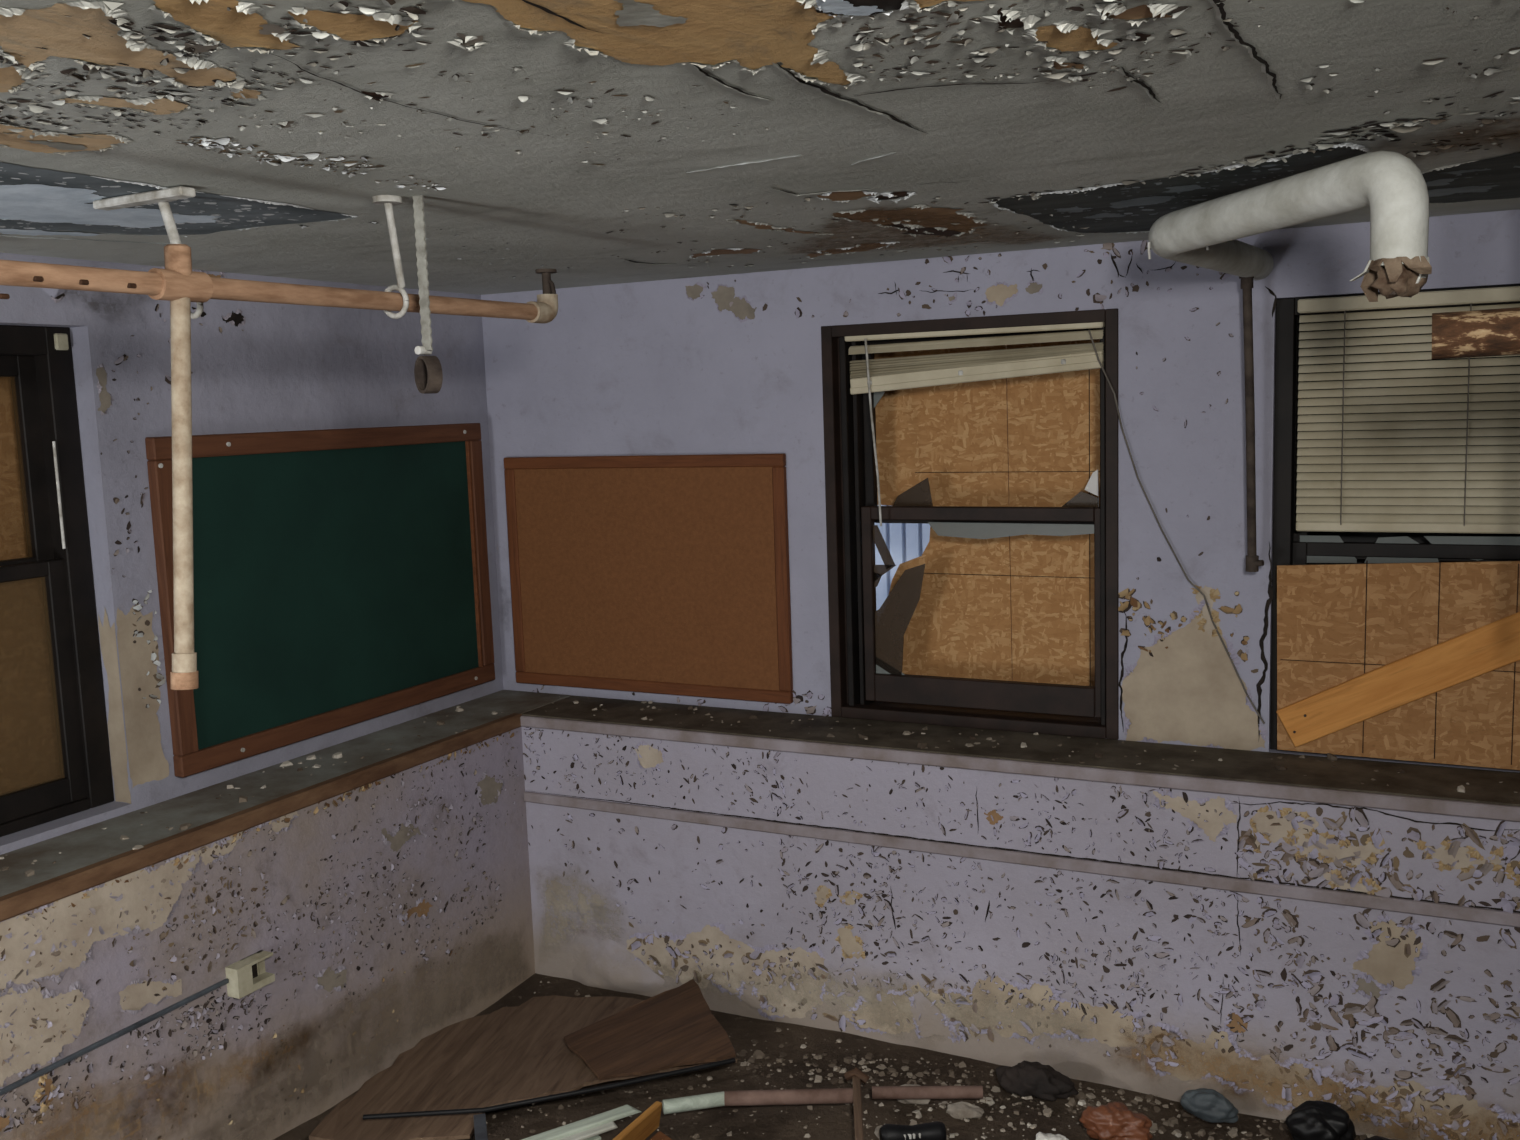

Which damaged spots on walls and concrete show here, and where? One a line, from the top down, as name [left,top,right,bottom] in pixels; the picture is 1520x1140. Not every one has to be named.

peeling [463,0,1240,92]
crack [1210,0,1282,99]
peeling [0,0,692,237]
crack [686,63,1057,196]
water stain [800,208,1051,252]
peeling [604,47,1520,323]
peeling [96,354,141,415]
peeling [112,475,148,577]
peeling [1118,577,1268,751]
peeling [0,727,1520,1140]
water stain [23,939,525,1140]